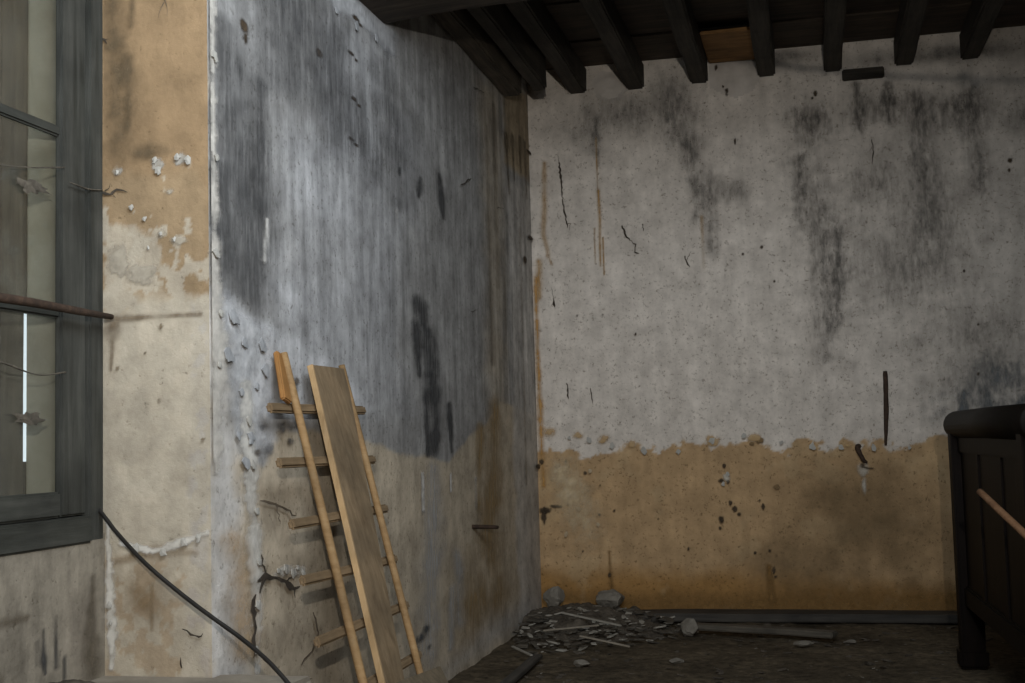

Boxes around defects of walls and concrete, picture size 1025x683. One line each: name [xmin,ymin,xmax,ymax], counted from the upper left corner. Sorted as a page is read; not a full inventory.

peeling [152,153,191,175]
leakage [254,80,269,207]
leakage [413,323,421,377]
spalling [540,504,569,524]
crack [251,554,324,679]